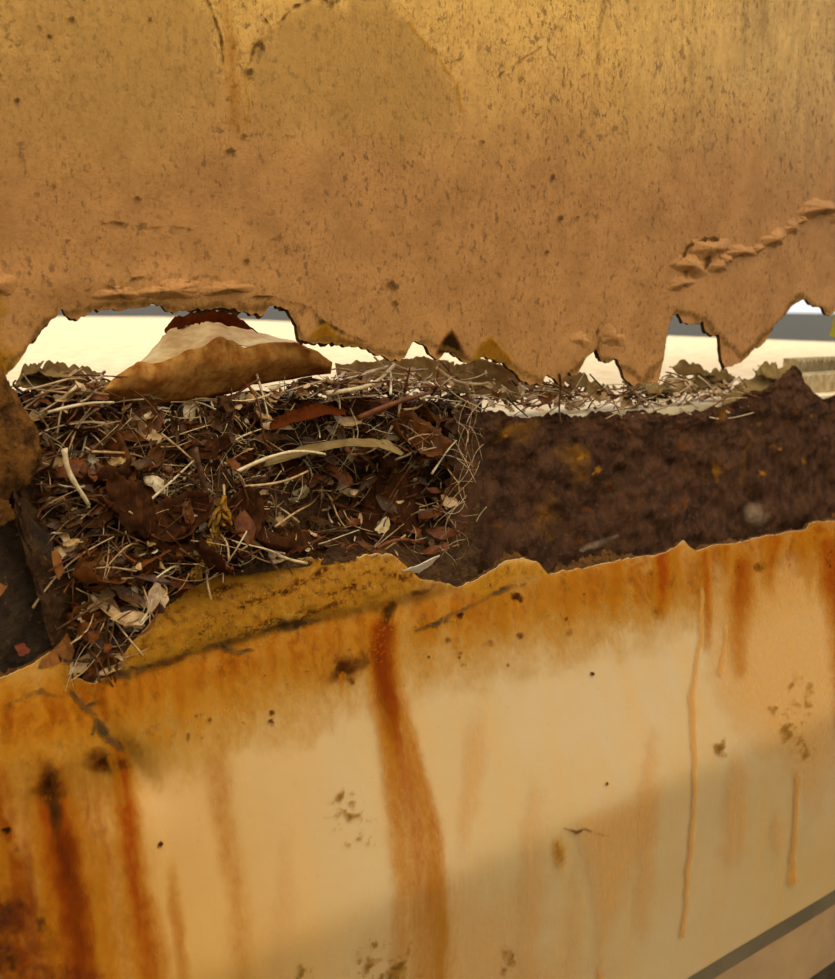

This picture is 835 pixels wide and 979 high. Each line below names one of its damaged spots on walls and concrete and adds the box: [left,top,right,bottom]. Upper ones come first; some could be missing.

crack [206,0,227,80]
crack [250,0,339,60]
peeling [438,331,517,373]
peeling [0,498,16,527]
peeling [51,550,65,579]
peeling [465,562,550,593]
peeling [121,554,440,666]
spalling [511,592,523,617]
peeling [14,643,30,657]
spalling [334,656,368,686]
corrosion [0,513,835,979]
spalling [781,722,810,758]